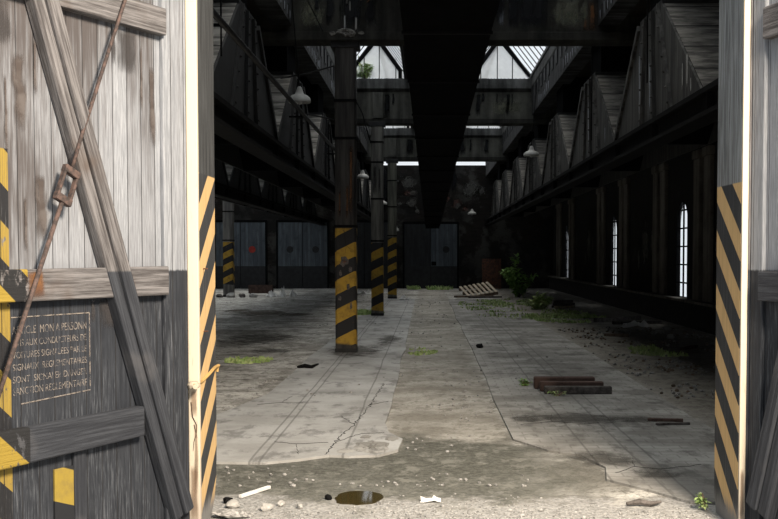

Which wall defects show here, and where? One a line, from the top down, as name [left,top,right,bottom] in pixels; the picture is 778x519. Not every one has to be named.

crack [281,384,388,454]